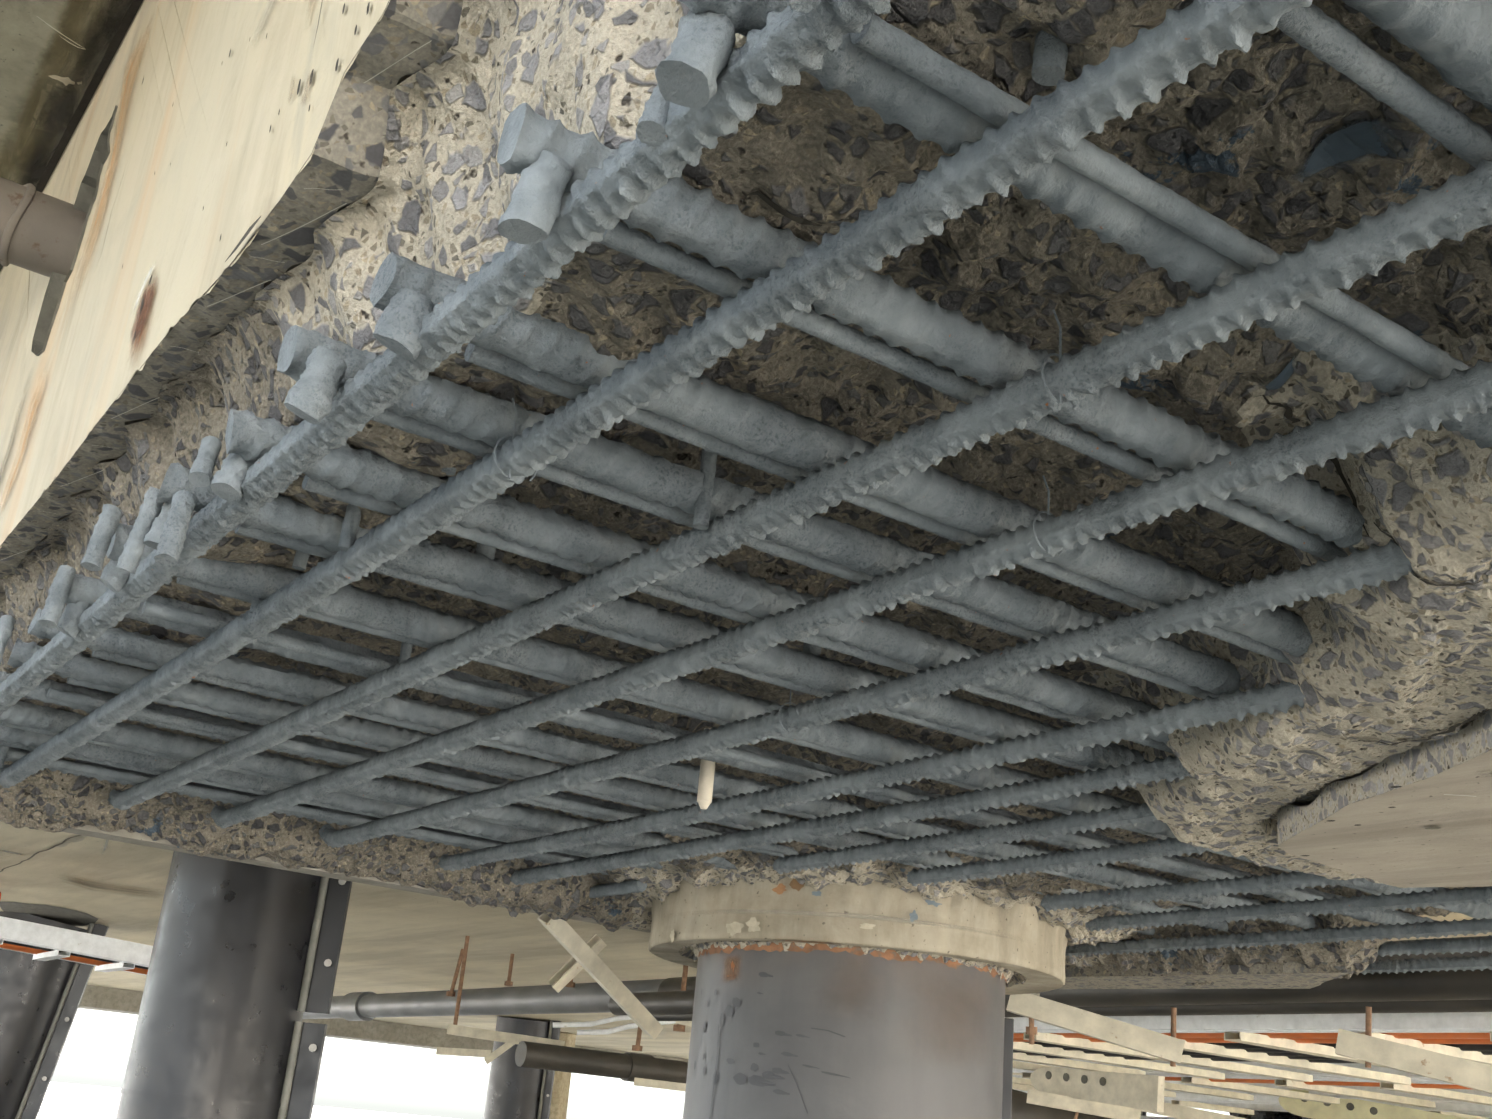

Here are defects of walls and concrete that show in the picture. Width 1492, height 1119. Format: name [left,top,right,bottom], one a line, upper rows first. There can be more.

spalling [31,105,118,356]
corrosion [131,270,154,354]
spalling [565,777,698,811]
spalling [902,777,974,796]
spalling [519,791,653,821]
spalling [668,825,727,838]
spalling [691,822,741,833]
spalling [715,807,817,828]
spalling [998,803,1062,820]
spalling [1092,827,1158,844]
spalling [961,841,1057,859]
spalling [1054,864,1183,888]